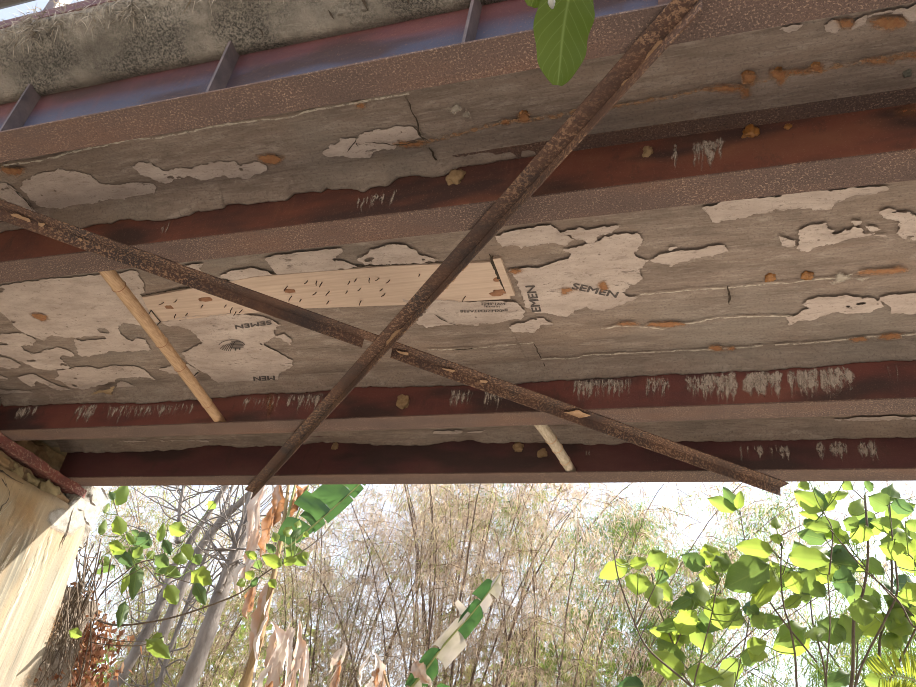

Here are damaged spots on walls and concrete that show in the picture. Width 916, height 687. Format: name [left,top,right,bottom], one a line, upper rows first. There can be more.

crack [347,99,437,160]
efflorescence [693,138,722,163]
peeling [416,225,728,334]
peeling [0,275,178,394]
peeling [118,270,293,382]
peeling [786,293,916,325]
efflorescence [573,379,629,396]
efflorescence [686,367,853,398]
water stain [740,445,789,458]
efflorescence [816,441,847,456]
crack [0,470,23,511]
spalling [49,486,108,548]